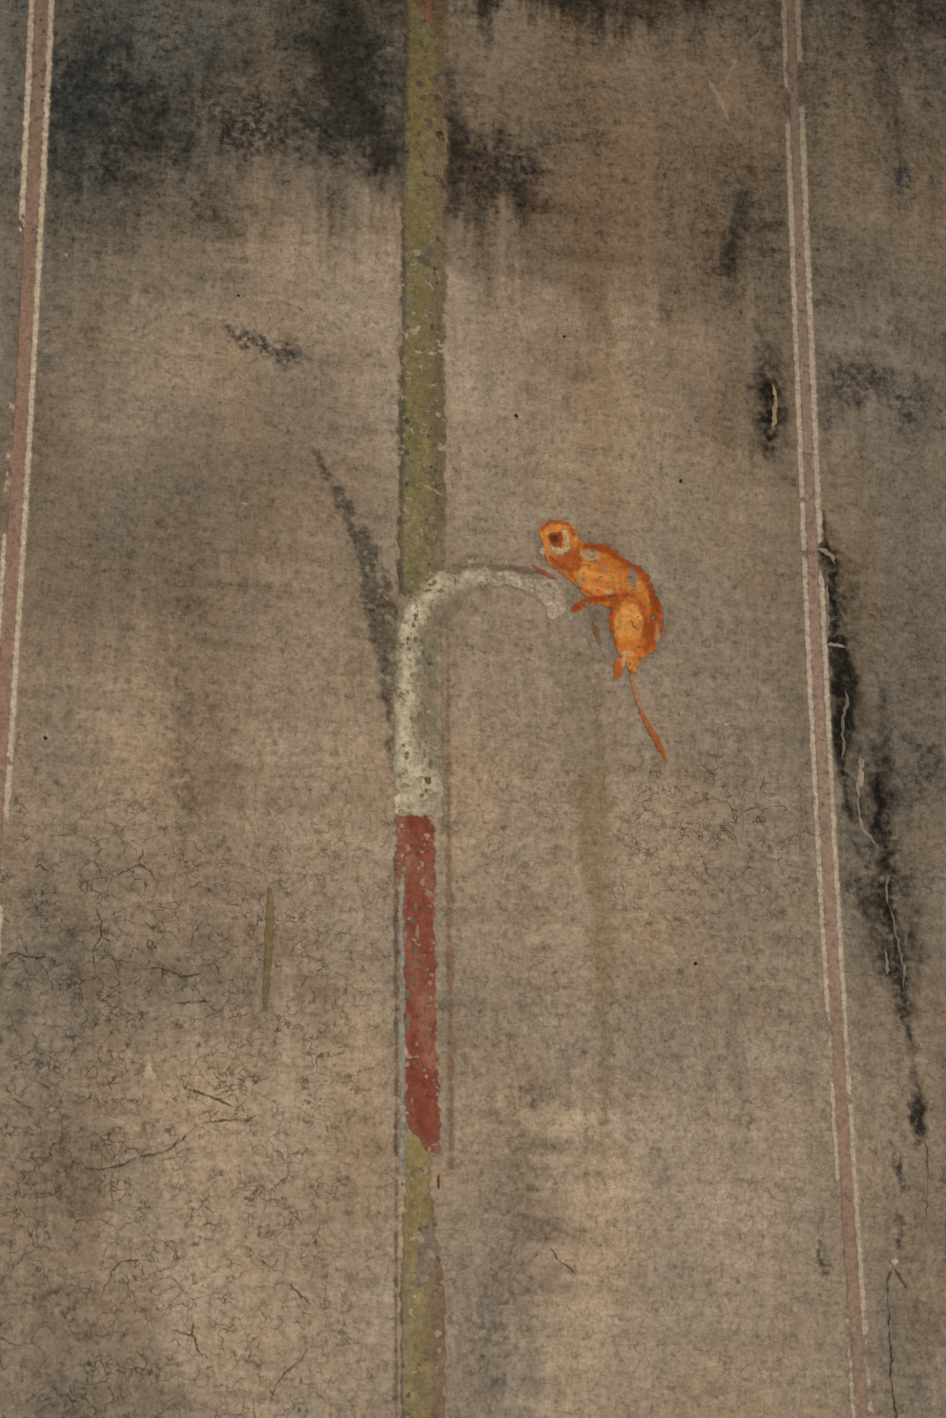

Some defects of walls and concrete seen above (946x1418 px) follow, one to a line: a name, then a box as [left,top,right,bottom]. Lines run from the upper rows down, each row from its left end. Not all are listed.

damp [757,365,784,459]
damp [820,514,940,1046]
crack [118,850,155,880]
crack [93,907,103,961]
crack [8,952,53,991]
crack [143,967,210,1004]
crack [91,1089,256,1176]
crack [103,1259,152,1293]
crack [166,1321,202,1355]
crack [886,1268,907,1418]
crack [268,1349,308,1406]